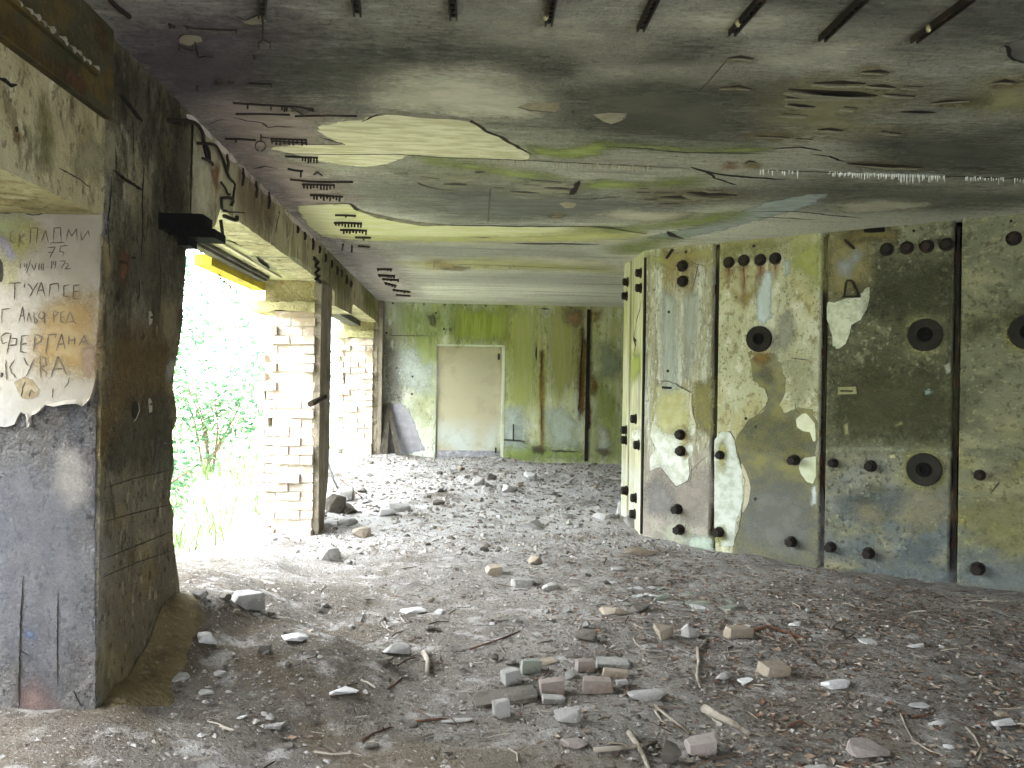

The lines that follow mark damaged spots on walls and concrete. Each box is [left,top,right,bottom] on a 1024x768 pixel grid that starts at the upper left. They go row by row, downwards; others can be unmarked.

water stain [132,0,1024,240]
flaking render [167,102,647,288]
rust [726,264,778,304]
flaking render [826,234,871,349]
water stain [385,348,435,401]
water stain [504,408,525,448]
water stain [544,409,578,449]
peeling [796,413,816,441]
peeling [649,382,743,546]
peeling [799,456,816,484]